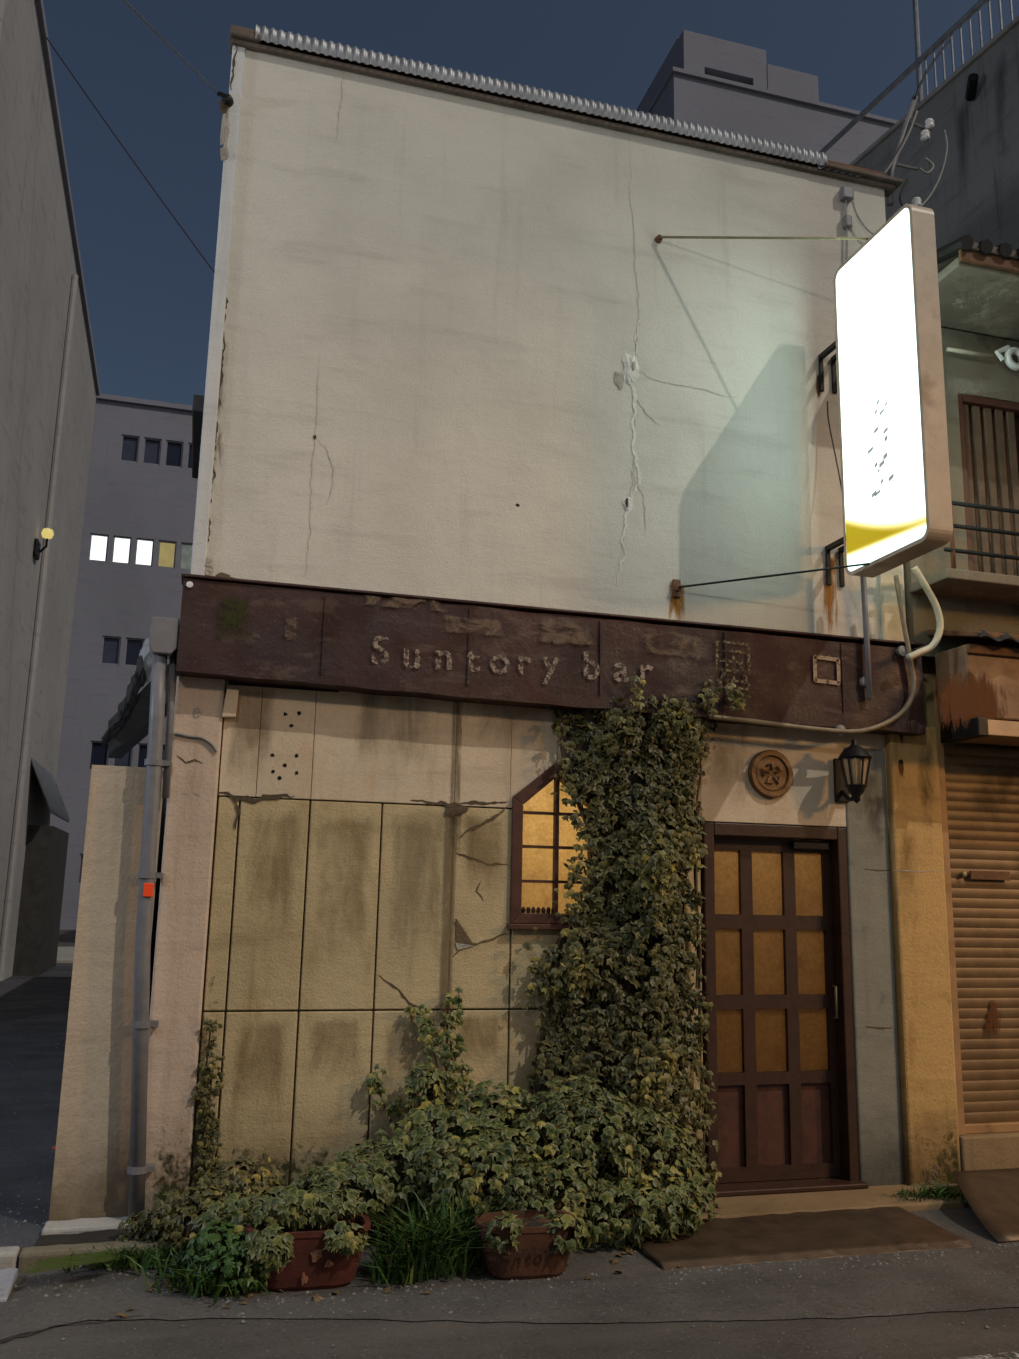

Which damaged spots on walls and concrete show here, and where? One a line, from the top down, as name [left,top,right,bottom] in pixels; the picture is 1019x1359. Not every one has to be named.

crack [613,136,734,585]
crack [306,360,334,571]
rust [670,585,684,619]
rust [824,559,837,624]
damp [440,702,462,1013]
crack [410,800,509,900]
crack [453,919,507,957]